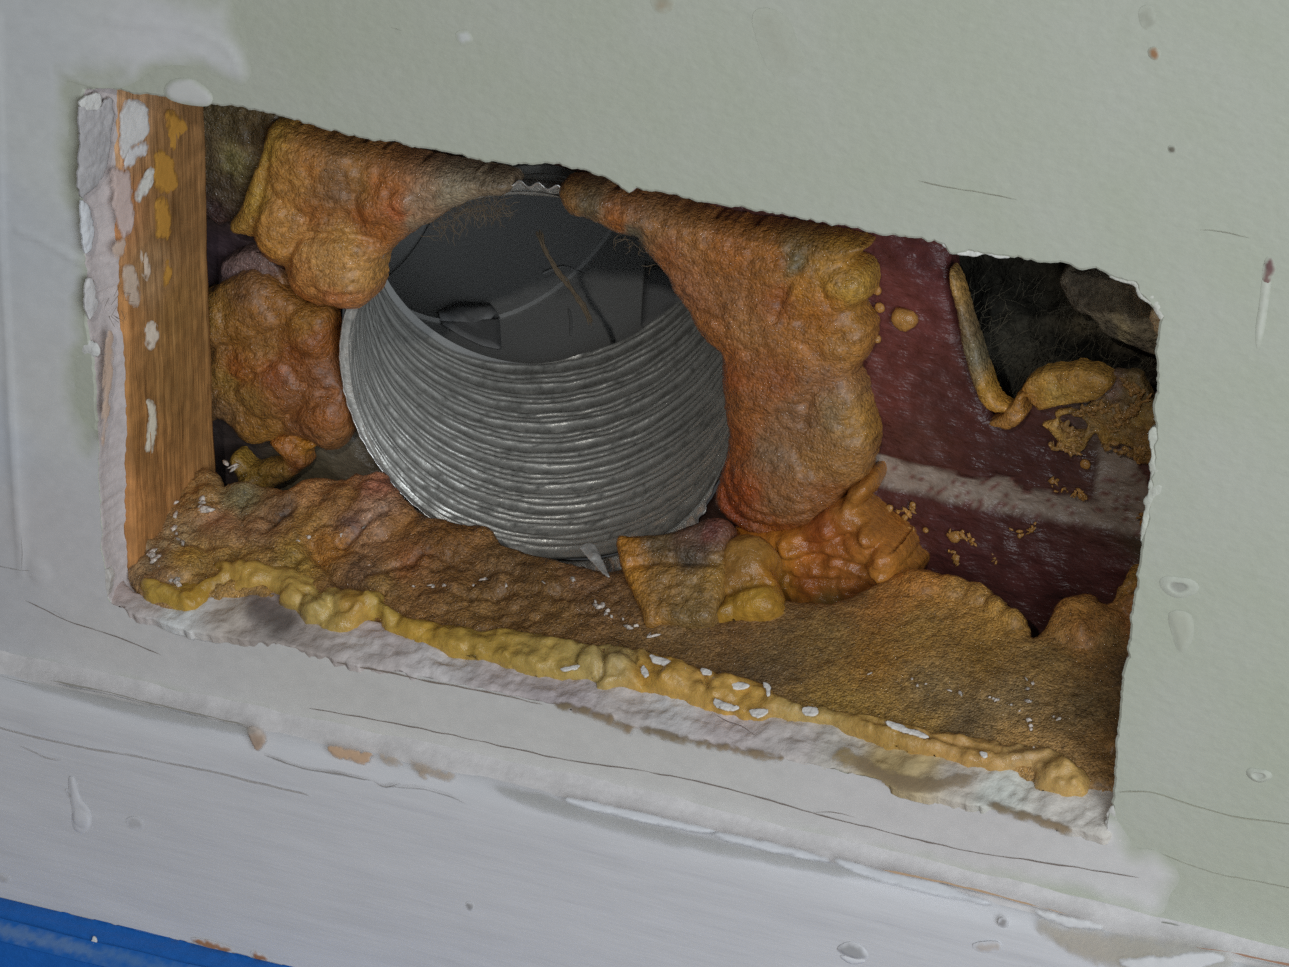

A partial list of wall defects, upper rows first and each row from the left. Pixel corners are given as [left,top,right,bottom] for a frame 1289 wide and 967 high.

crack [29,602,162,656]
peeling [246,726,266,751]
peeling [328,746,454,780]
crack [310,708,1138,878]
peeling [565,797,989,904]
peeling [1035,910,1233,967]